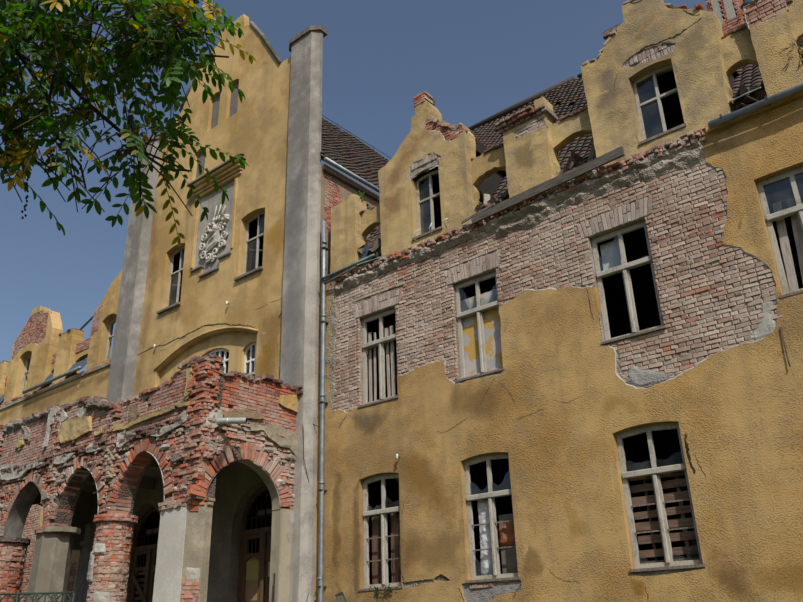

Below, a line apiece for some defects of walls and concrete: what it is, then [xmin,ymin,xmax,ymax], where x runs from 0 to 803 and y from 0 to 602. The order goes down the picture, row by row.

crack [614,10,701,89]
flaking render [324,160,782,413]
flaking render [0,461,43,481]
flaking render [42,368,193,466]
crack [684,434,706,476]
flaking render [20,488,49,602]
spalling [462,580,521,602]